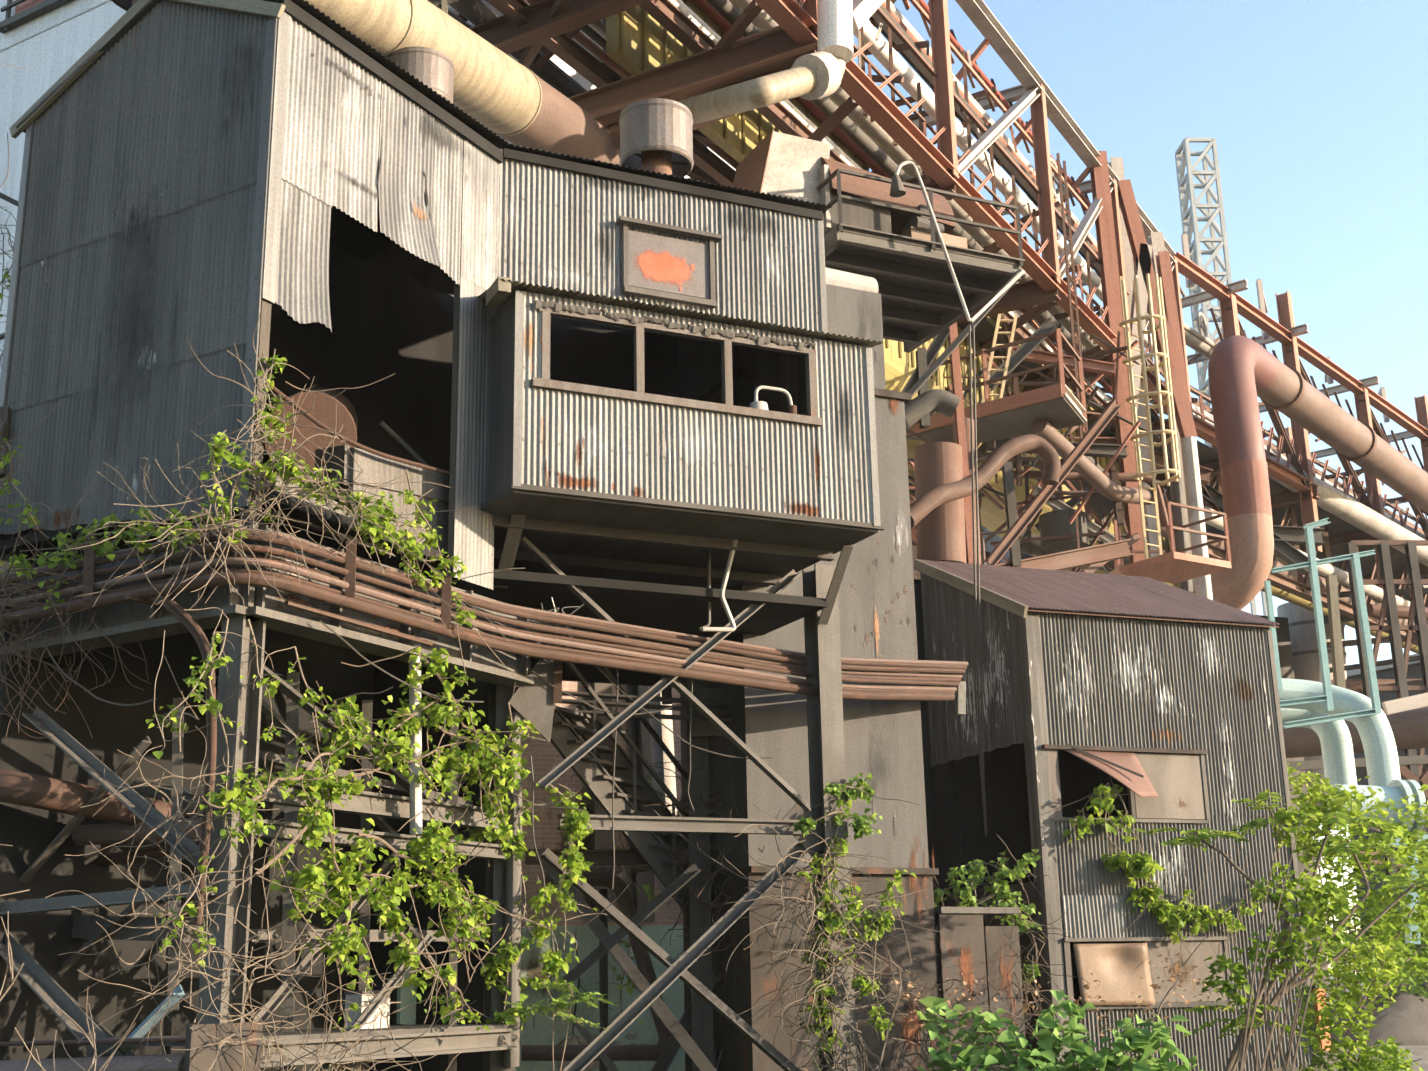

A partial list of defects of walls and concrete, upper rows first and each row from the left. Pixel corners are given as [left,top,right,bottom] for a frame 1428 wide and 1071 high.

corrosion [541,423,615,494]
corrosion [785,502,820,516]
peeling [1054,632,1193,728]
peeling [1192,631,1227,679]
peeling [1216,705,1243,858]
corrosion [951,948,974,998]